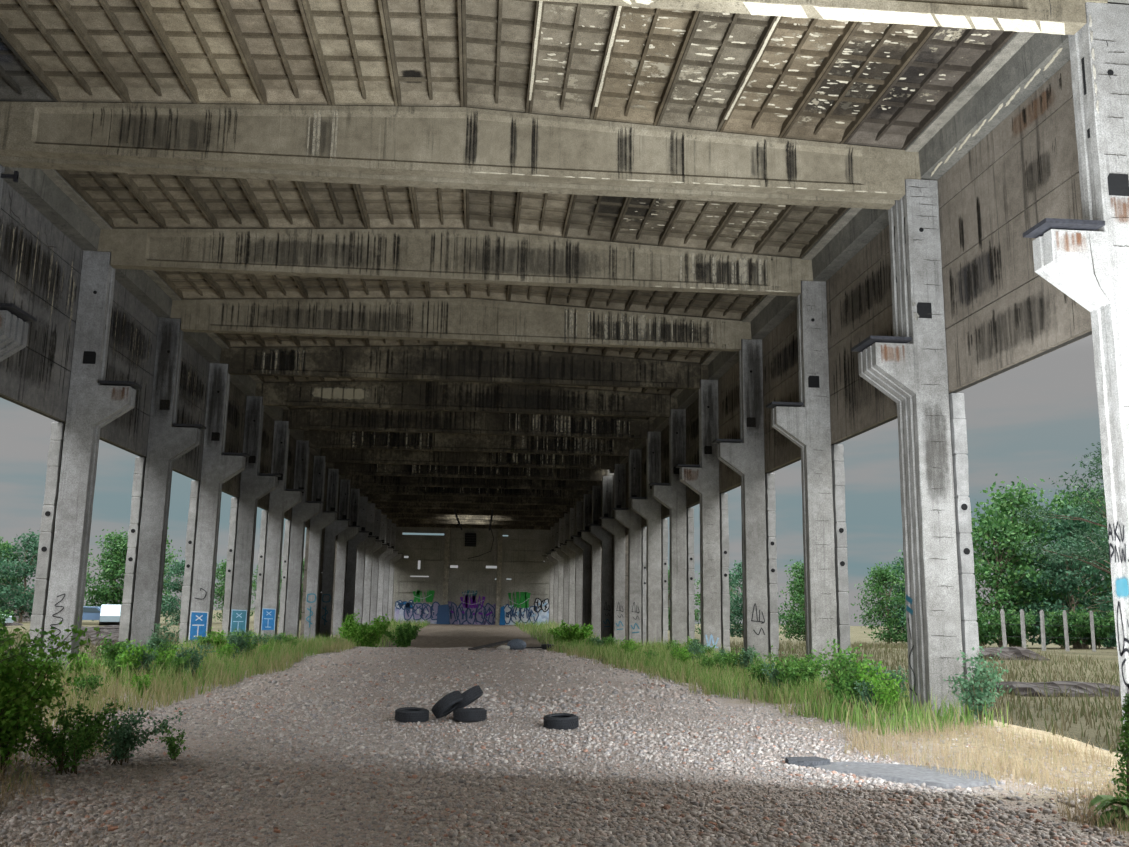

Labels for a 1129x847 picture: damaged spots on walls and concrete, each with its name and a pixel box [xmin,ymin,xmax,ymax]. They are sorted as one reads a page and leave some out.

peeling [536,0,1065,176]
water stain [307,112,338,158]
water stain [466,114,478,159]
water stain [618,129,634,174]
water stain [671,134,684,175]
water stain [213,232,290,264]
water stain [309,233,400,270]
water stain [430,233,527,279]
water stain [549,242,579,276]
water stain [680,254,767,285]
water stain [950,200,1001,308]
water stain [300,349,634,496]